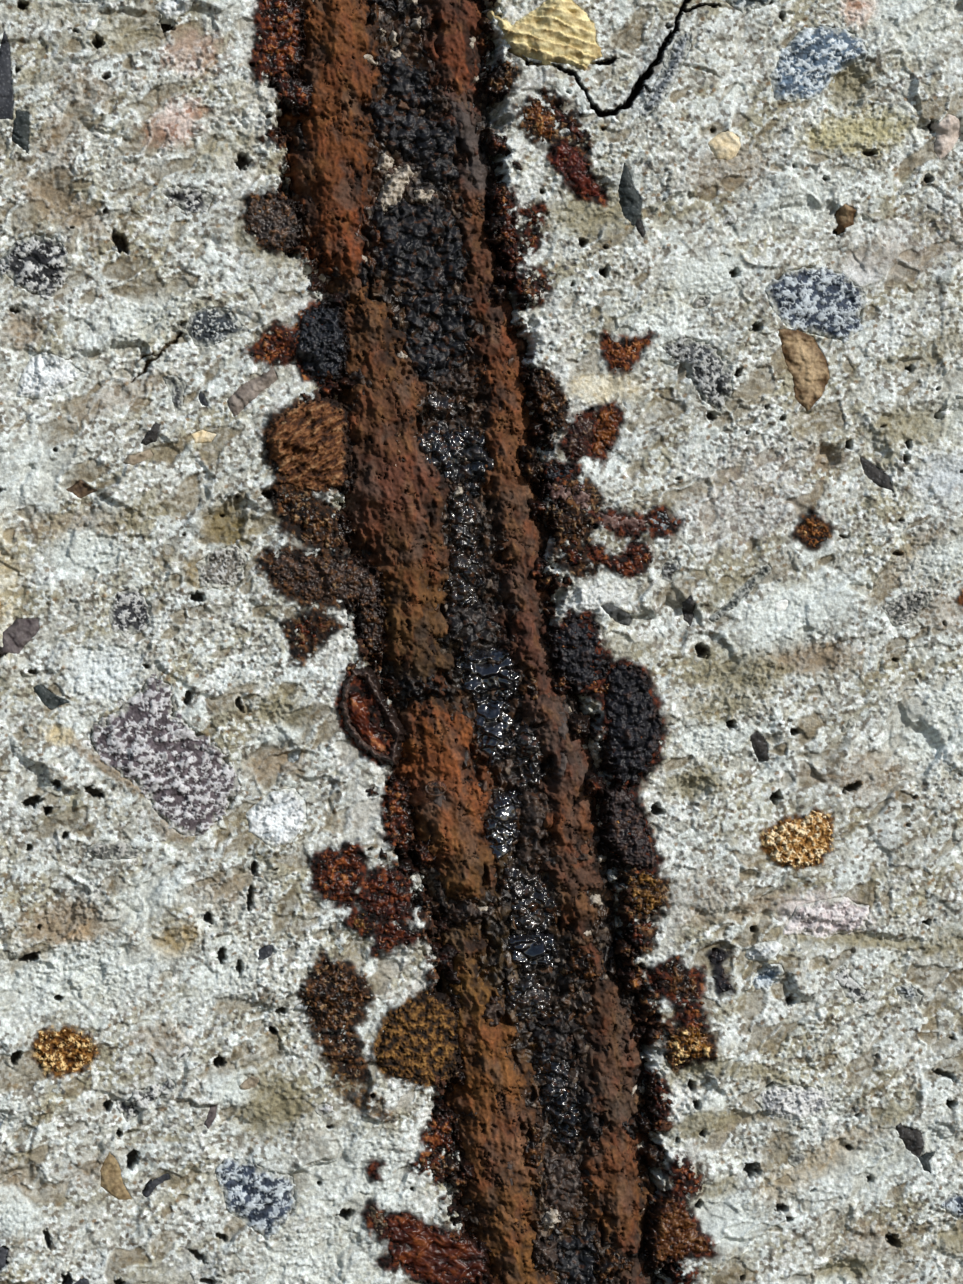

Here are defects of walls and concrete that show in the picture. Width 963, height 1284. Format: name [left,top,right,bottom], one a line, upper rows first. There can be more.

corrosion [240,0,556,1284]
corrosion [411,0,736,1284]
crack [507,0,720,117]